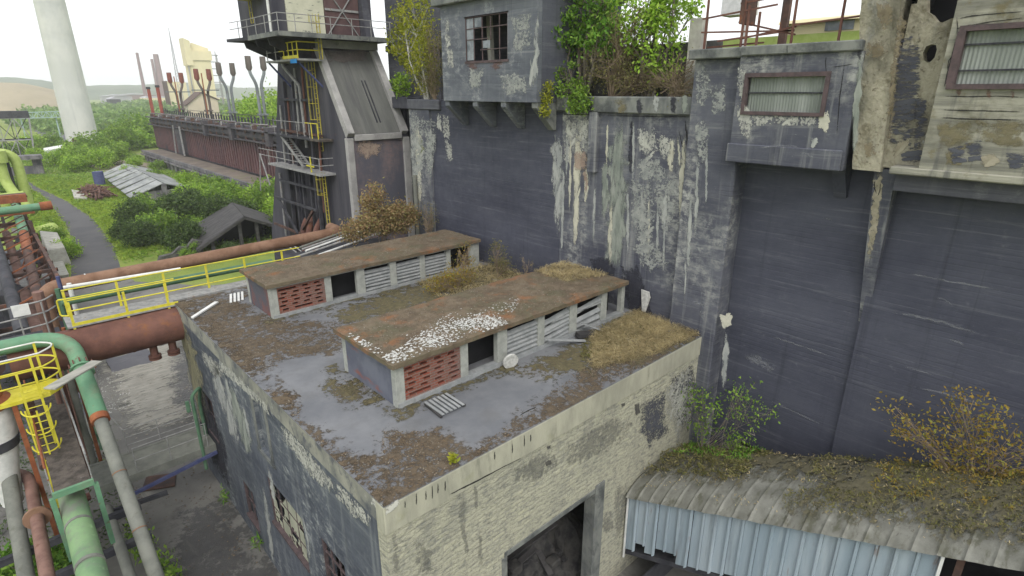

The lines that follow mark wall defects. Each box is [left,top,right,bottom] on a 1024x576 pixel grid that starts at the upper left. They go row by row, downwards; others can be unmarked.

damp [415,127,424,201]
damp [550,95,708,315]
peeling [695,64,830,166]
peeling [866,3,928,162]
peeling [948,141,1024,169]
spalling [719,313,733,385]